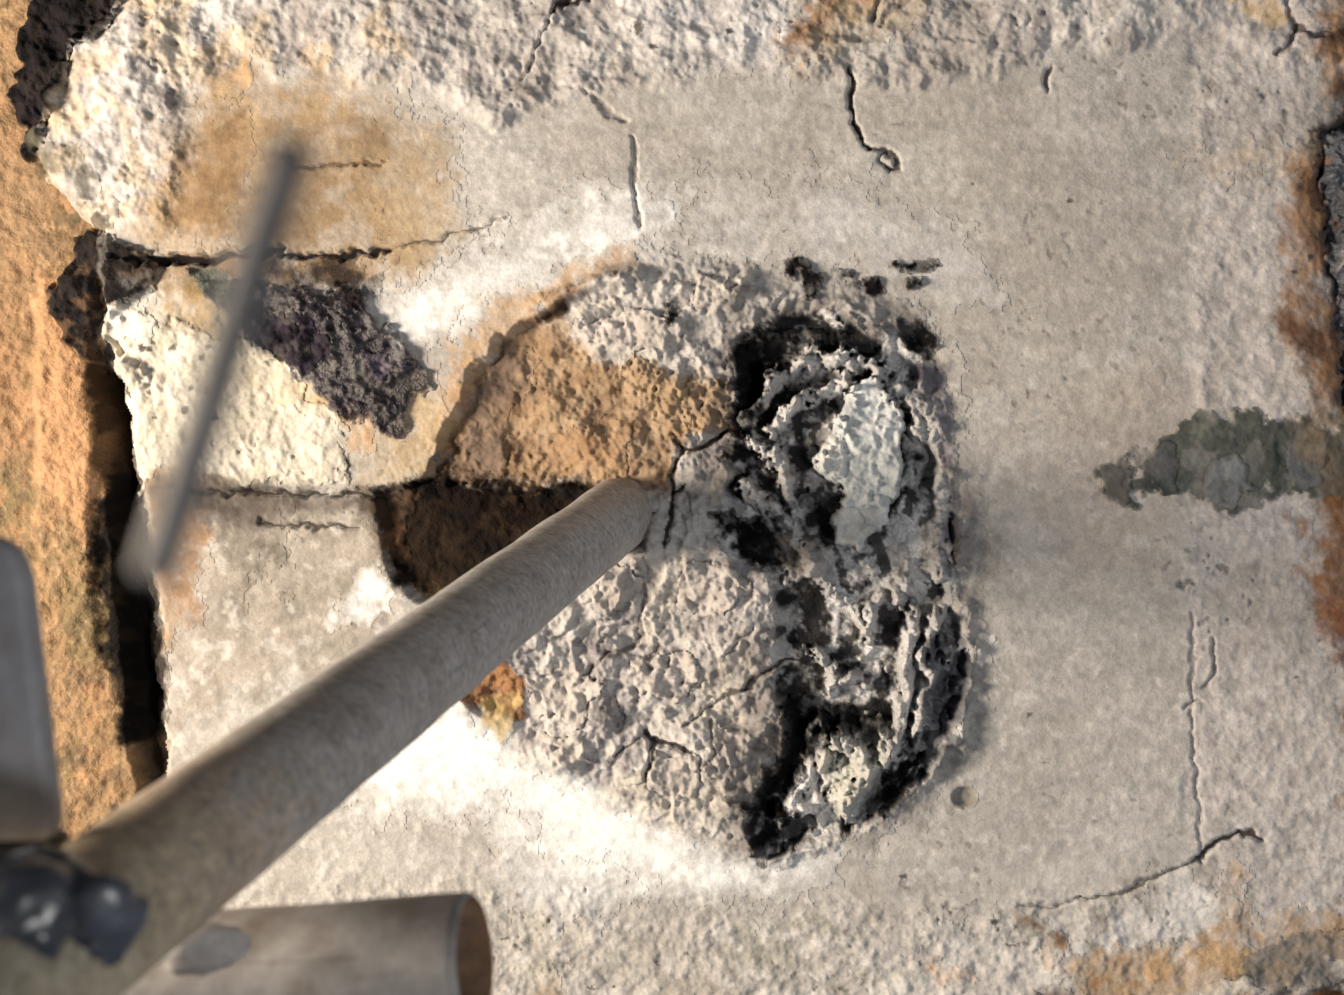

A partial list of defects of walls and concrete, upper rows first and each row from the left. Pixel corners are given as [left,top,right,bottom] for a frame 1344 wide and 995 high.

crack [522,0,591,80]
crack [847,66,901,172]
crack [109,251,232,268]
crack [283,218,501,262]
rust [343,234,646,486]
spalling [437,243,1012,882]
rust [1281,496,1344,752]
rust [1010,852,1344,995]